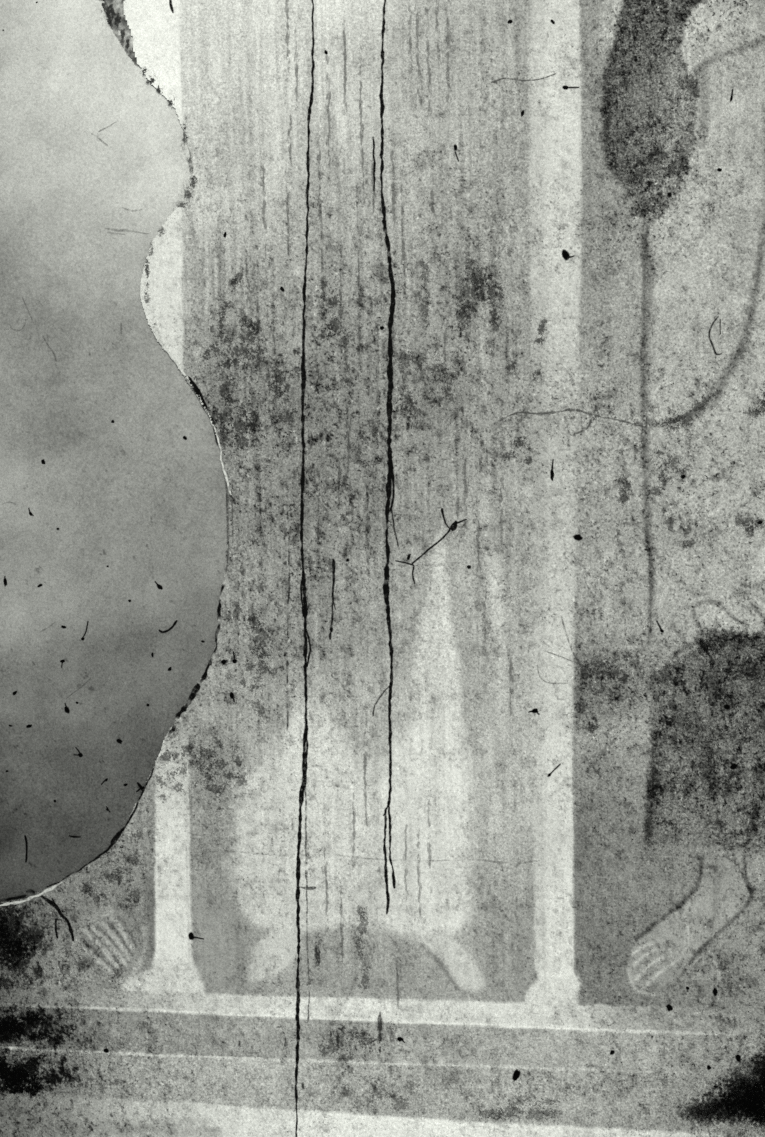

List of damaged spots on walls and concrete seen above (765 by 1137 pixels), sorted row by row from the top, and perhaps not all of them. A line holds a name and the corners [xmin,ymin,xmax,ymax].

spalling [99,0,175,108]
spalling [176,124,198,208]
spalling [143,228,164,303]
peeling [150,301,297,495]
crack [373,0,467,914]
crack [286,0,336,1137]
leakage [0,901,54,989]
spalling [0,882,63,906]
leakage [0,996,83,1098]
leakage [681,1046,765,1127]